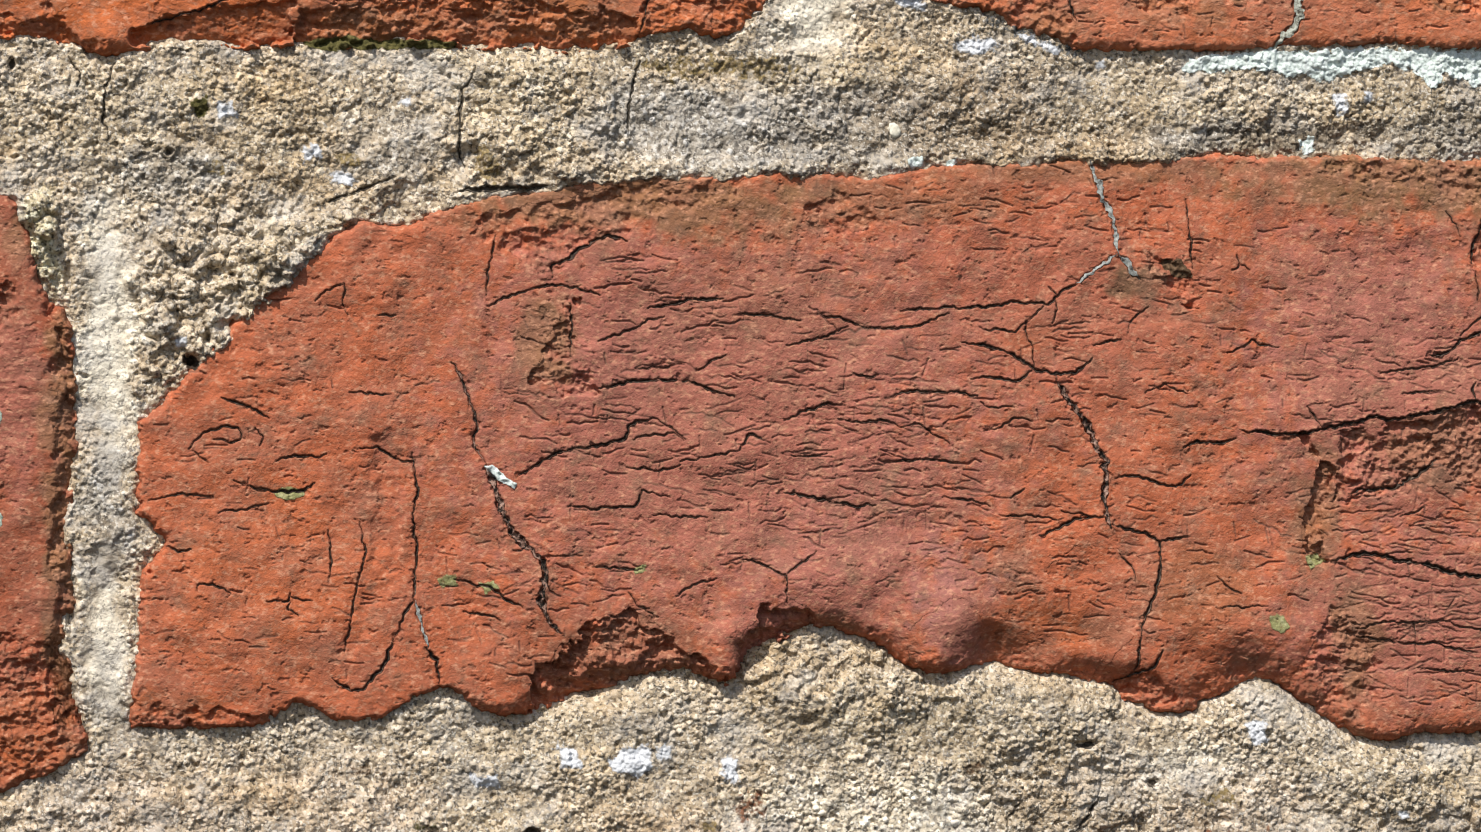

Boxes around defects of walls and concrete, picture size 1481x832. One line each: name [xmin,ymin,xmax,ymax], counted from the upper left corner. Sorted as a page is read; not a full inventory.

crack [1273,0,1305,48]
damp [1182,45,1481,88]
crack [329,176,396,202]
crack [155,398,325,512]
crack [452,160,1481,681]
spalling [1301,405,1481,571]
crack [271,528,367,643]
crack [332,447,440,691]